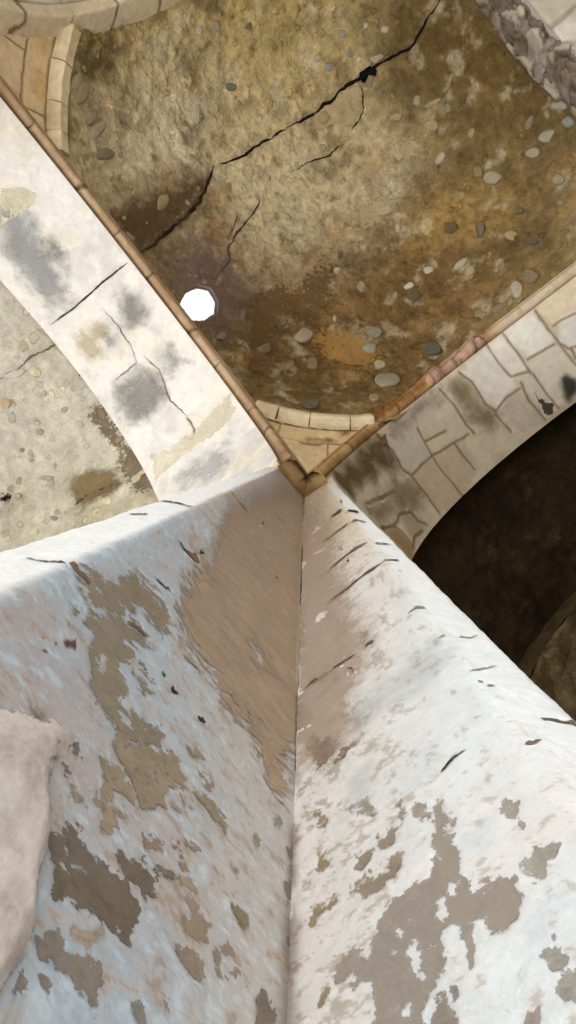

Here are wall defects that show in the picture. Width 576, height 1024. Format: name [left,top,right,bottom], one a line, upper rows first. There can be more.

leakage [4,214,62,297]
crack [0,0,440,434]
leakage [124,296,143,321]
leakage [118,374,166,419]
leakage [332,435,395,498]
peeling [61,467,356,835]
peeling [48,821,241,985]
peeling [308,893,338,929]
peeling [317,795,561,1024]
peeling [12,927,104,1007]
peeling [255,988,277,1024]
peeling [539,930,576,1003]